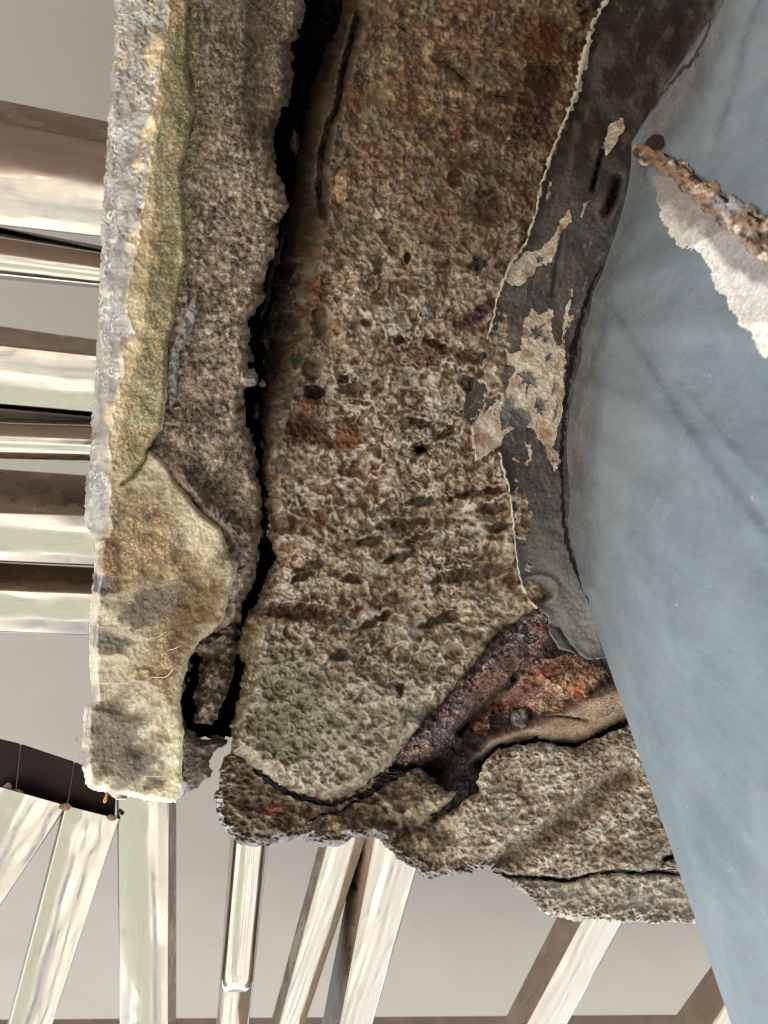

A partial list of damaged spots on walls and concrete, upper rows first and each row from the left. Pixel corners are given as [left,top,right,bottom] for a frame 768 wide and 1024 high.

peeling [631,134,768,358]
crack [180,0,359,738]
spalling [149,0,629,817]
crack [253,759,422,823]
rust [398,609,609,769]
crack [493,853,680,882]